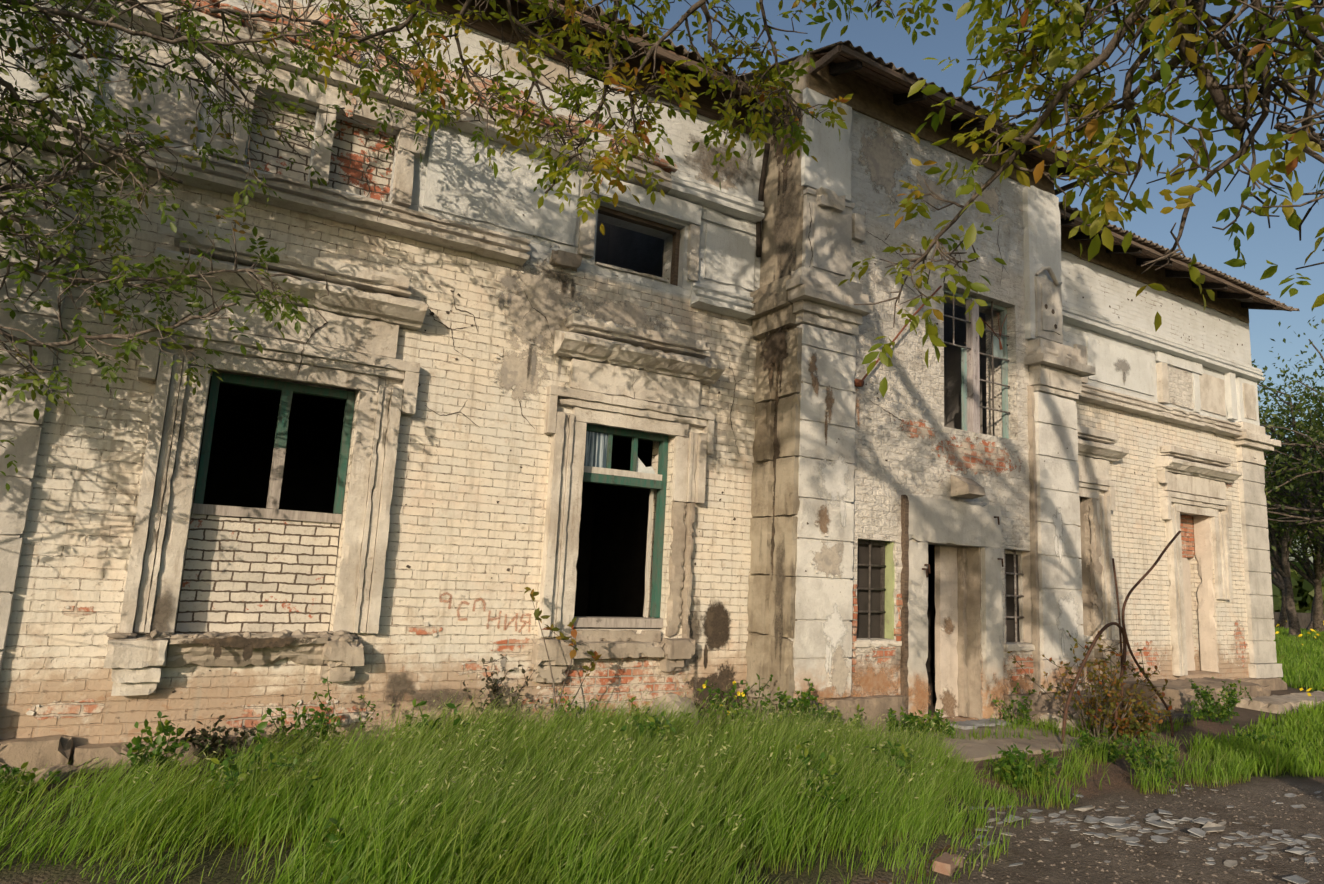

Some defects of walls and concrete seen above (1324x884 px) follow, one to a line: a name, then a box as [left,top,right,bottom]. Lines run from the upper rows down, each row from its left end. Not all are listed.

spalling [894,417,1022,476]
spalling [457,638,533,678]
leakage [686,600,745,716]
spalling [865,646,898,664]
spalling [1005,651,1033,681]